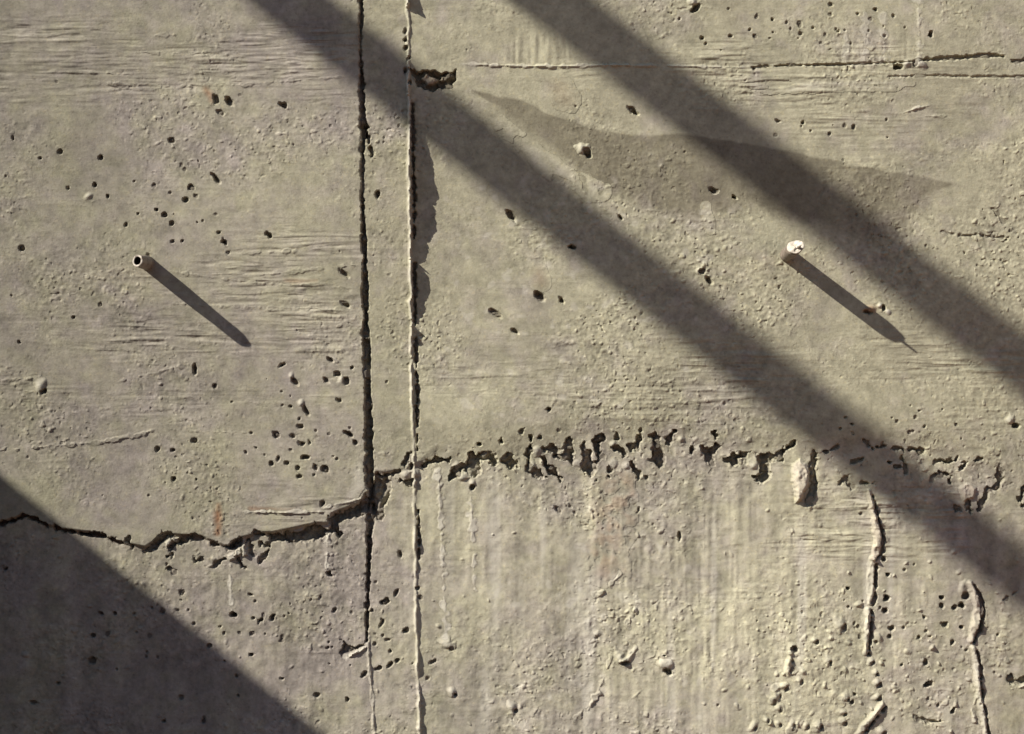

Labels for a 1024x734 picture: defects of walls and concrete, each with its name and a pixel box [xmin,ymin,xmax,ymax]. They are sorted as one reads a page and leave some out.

spalling [406,67,457,325]
spalling [277,361,300,387]
spalling [322,356,351,403]
crack [0,512,125,545]
spalling [268,404,330,479]
spalling [123,425,840,576]
spalling [837,437,1006,516]
spalling [1016,484,1024,509]
spalling [361,588,415,678]